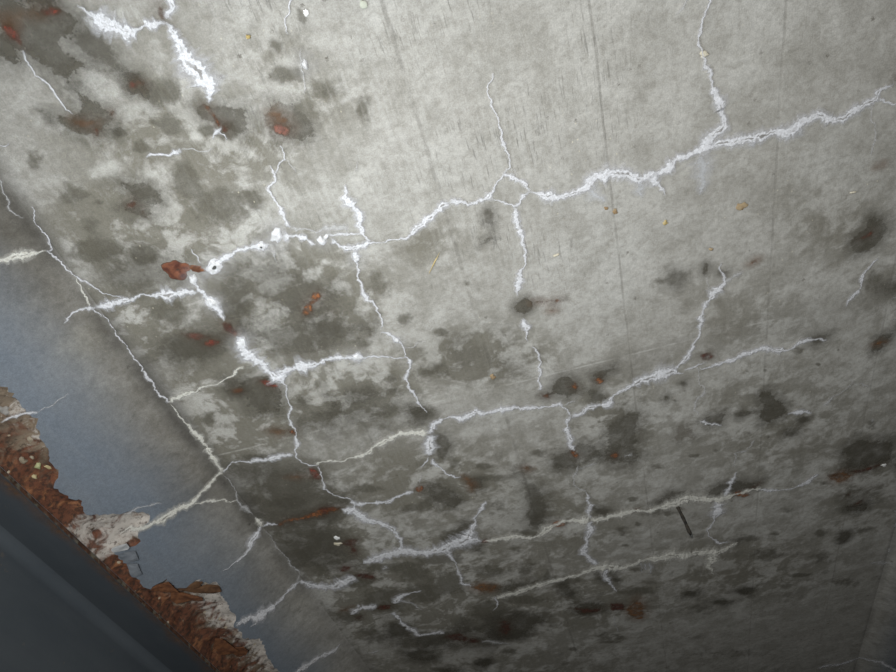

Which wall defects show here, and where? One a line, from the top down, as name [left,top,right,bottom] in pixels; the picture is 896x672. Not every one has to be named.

leakage [0,0,150,99]
crack [80,0,216,100]
leakage [58,92,120,136]
crack [384,0,896,294]
leakage [120,182,163,218]
crack [0,250,43,263]
leakage [514,298,532,314]
leakage [224,376,283,413]
crack [33,186,830,609]
spalling [0,387,279,672]
crack [237,563,356,626]
crack [351,591,444,636]